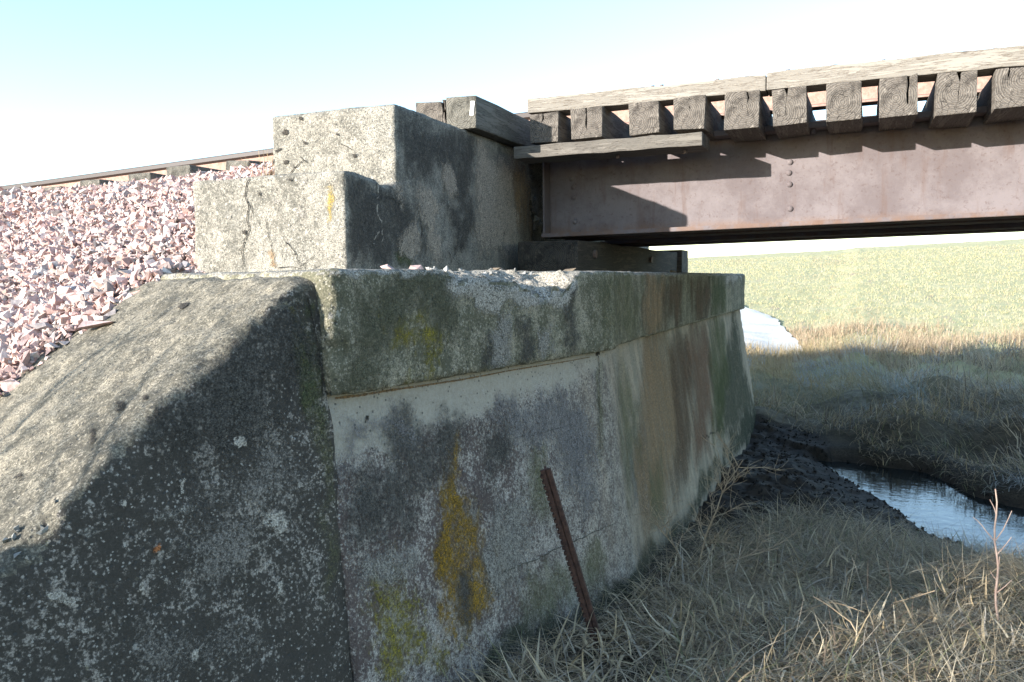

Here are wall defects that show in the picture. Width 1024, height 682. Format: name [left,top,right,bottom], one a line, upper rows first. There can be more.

crack [239,179,312,269]
damp [331,175,438,278]
damp [399,111,475,252]
damp [344,402,498,638]
damp [473,312,756,682]